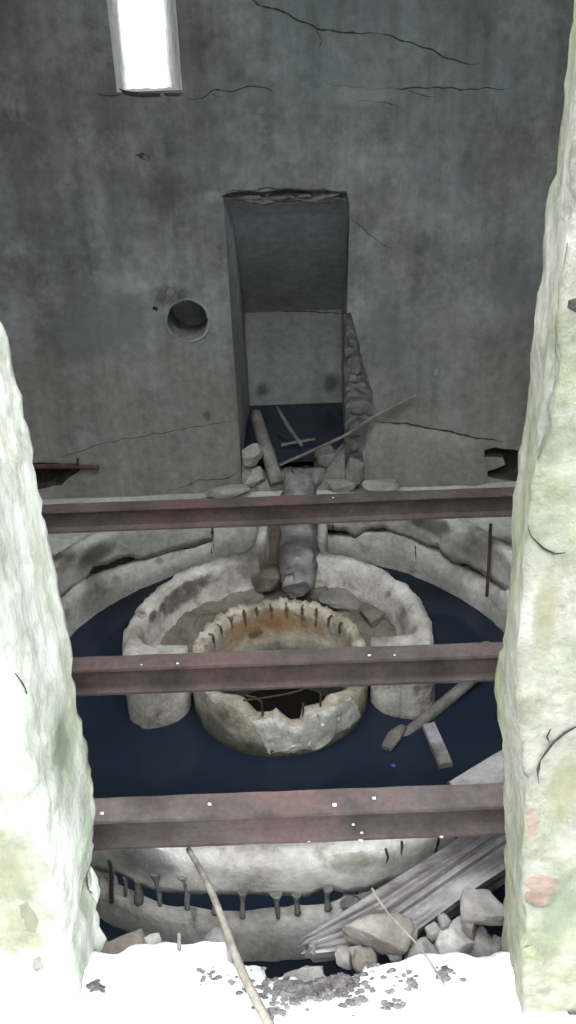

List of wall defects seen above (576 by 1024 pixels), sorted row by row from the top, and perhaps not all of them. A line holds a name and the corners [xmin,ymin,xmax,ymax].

crack [253,0,507,106]
crack [184,85,272,100]
crack [51,421,231,460]
crack [377,421,504,442]
spalling [484,447,519,481]
rust [208,603,288,645]
rust [301,604,343,633]
spalling [243,688,361,755]